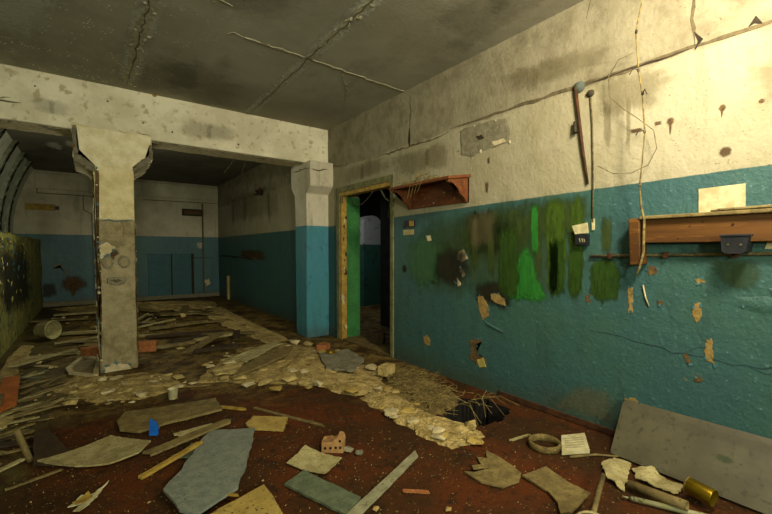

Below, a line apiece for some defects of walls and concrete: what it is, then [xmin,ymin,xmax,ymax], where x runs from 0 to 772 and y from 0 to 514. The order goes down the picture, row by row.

crack [118,0,163,87]
crack [227,0,772,158]
spalling [458,119,511,158]
peeling [478,293,506,321]
peeling [692,303,702,323]
peeling [469,338,486,368]
peeling [704,338,717,368]